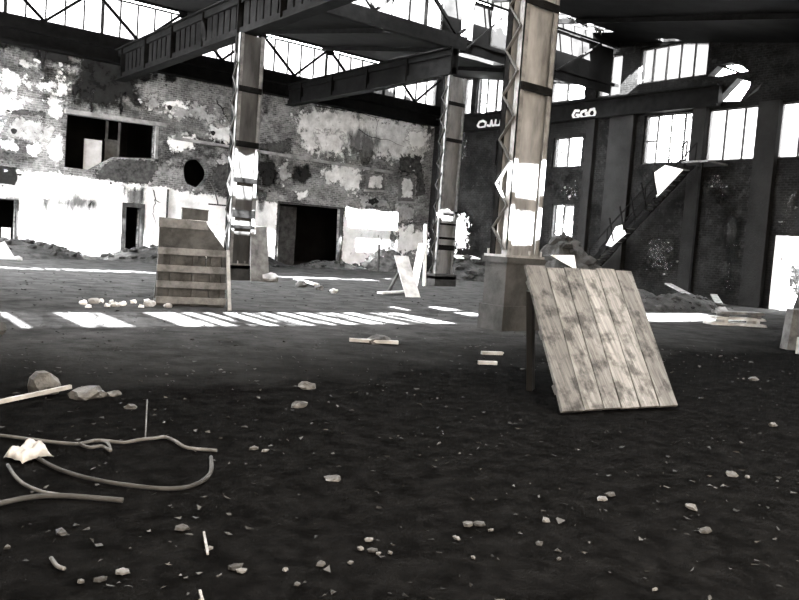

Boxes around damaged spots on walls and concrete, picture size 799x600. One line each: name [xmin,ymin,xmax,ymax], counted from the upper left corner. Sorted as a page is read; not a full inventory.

peeling [0,59,230,257]
flaking render [254,105,434,266]